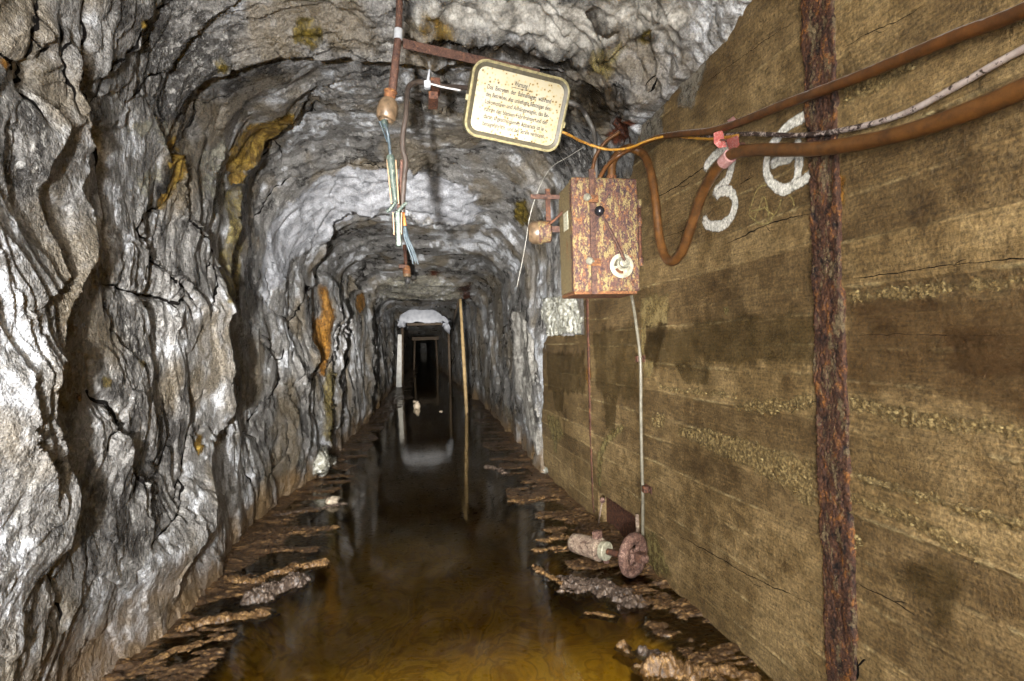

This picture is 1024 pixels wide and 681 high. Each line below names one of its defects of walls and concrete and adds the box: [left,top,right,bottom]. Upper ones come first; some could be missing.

crack [858,258,1024,278]
crack [681,537,812,604]